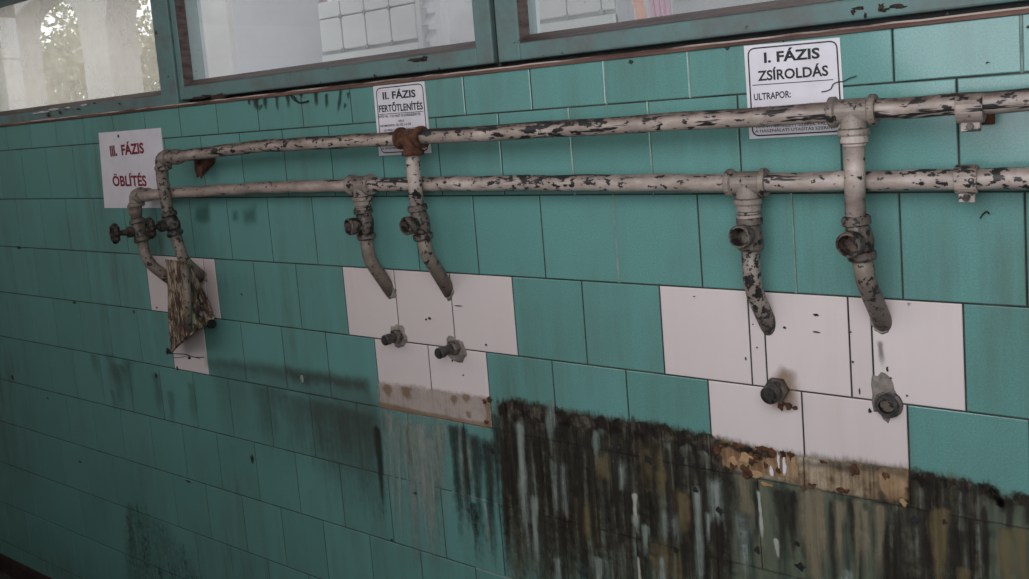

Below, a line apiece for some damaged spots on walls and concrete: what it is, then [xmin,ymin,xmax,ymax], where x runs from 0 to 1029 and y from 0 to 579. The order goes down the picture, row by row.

leakage [374,399,1029,579]